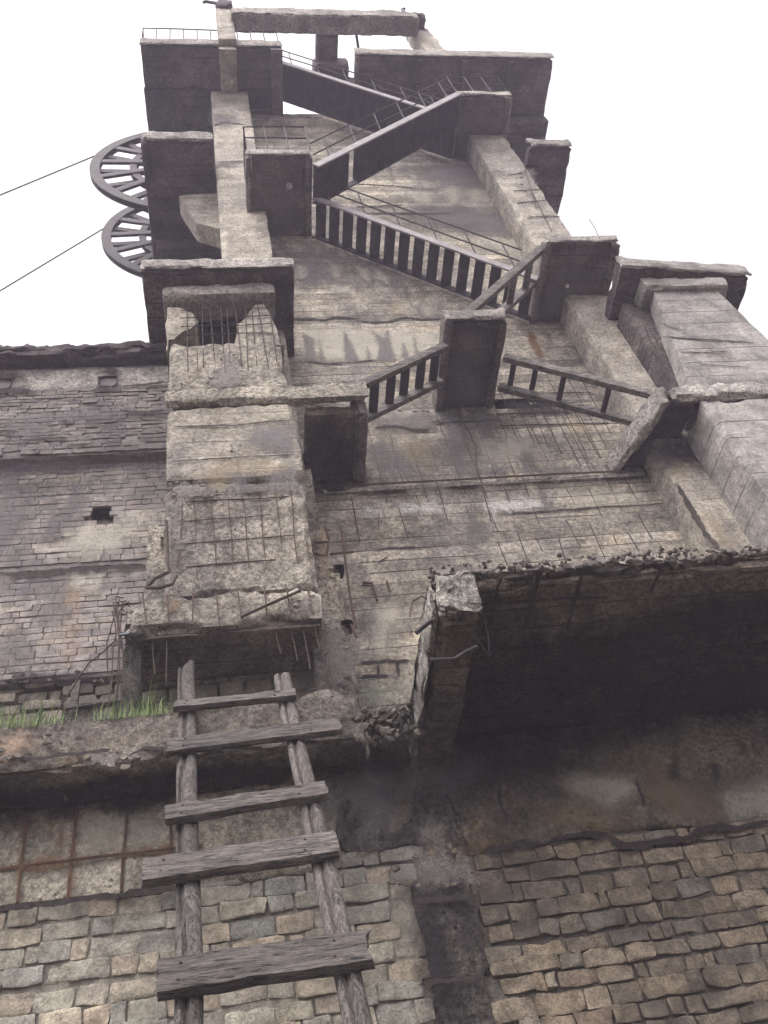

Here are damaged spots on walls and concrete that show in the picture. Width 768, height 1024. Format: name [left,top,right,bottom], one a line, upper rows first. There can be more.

spalling [171,301,277,390]
spalling [312,374,768,638]
crack [494,483,719,549]
spalling [142,480,298,624]
spalling [237,583,316,619]
spalling [331,702,427,755]
rust [0,795,176,912]
rust [197,784,295,800]
rust [198,805,305,851]
rust [200,864,312,884]
damp [570,776,637,806]
damp [723,784,768,819]